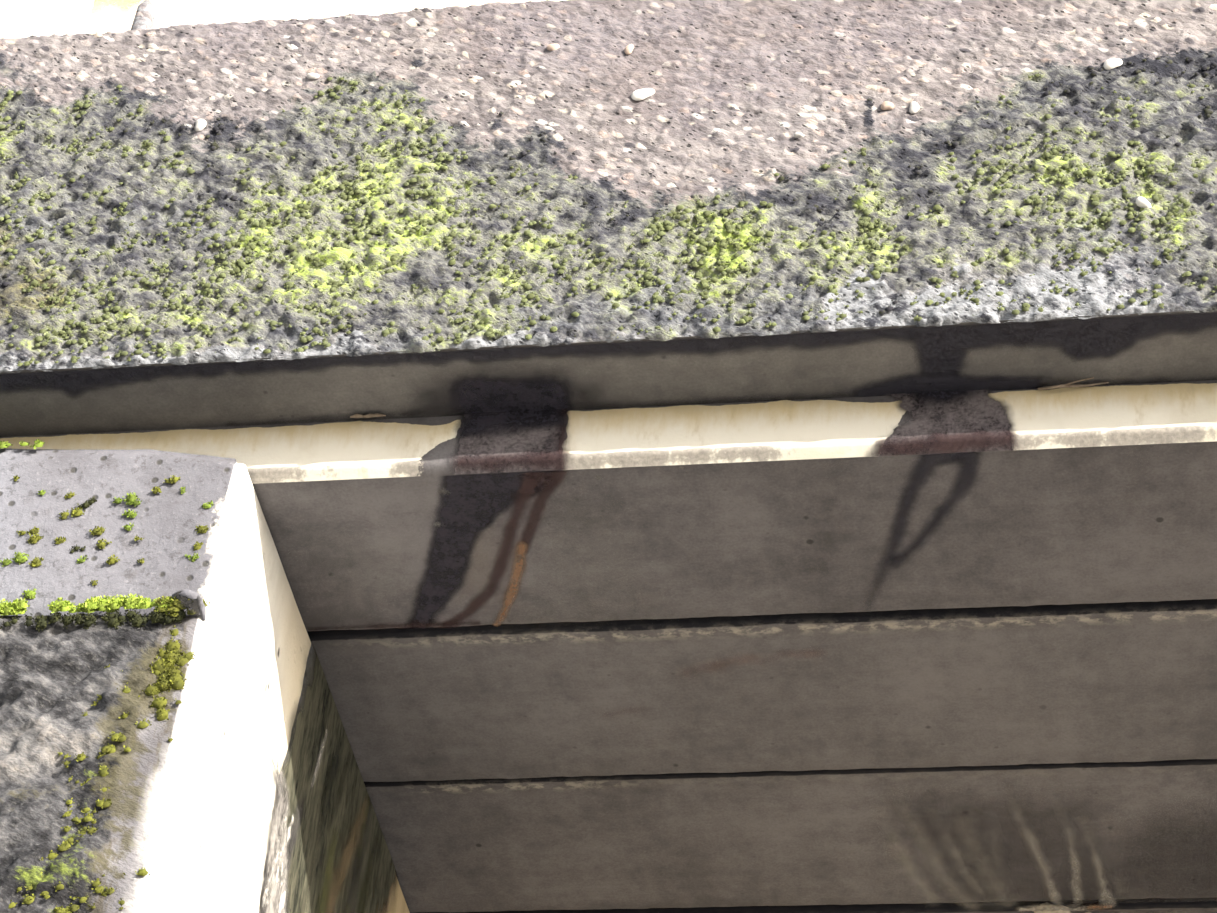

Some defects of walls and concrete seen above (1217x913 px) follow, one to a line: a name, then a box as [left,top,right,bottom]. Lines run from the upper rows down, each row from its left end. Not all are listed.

corrosion [368,373,599,629]
water stain [0,313,1217,575]
water stain [1019,844,1114,913]